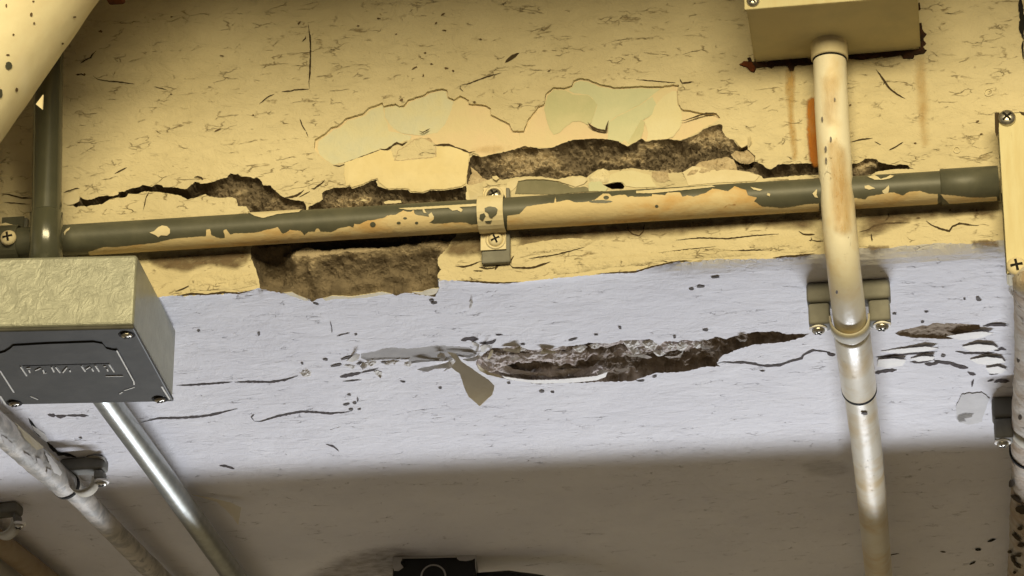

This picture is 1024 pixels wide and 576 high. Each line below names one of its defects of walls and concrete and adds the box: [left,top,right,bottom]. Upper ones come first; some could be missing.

crack [261,25,311,103]
spalling [63,80,832,212]
corrosion [739,57,813,139]
corrosion [807,98,818,166]
spalling [852,158,913,176]
corrosion [848,23,927,60]
spalling [251,233,456,305]
crack [176,376,297,386]
spalling [324,327,810,406]
crack [717,350,835,367]
spalling [877,312,1020,374]
crack [141,408,351,423]